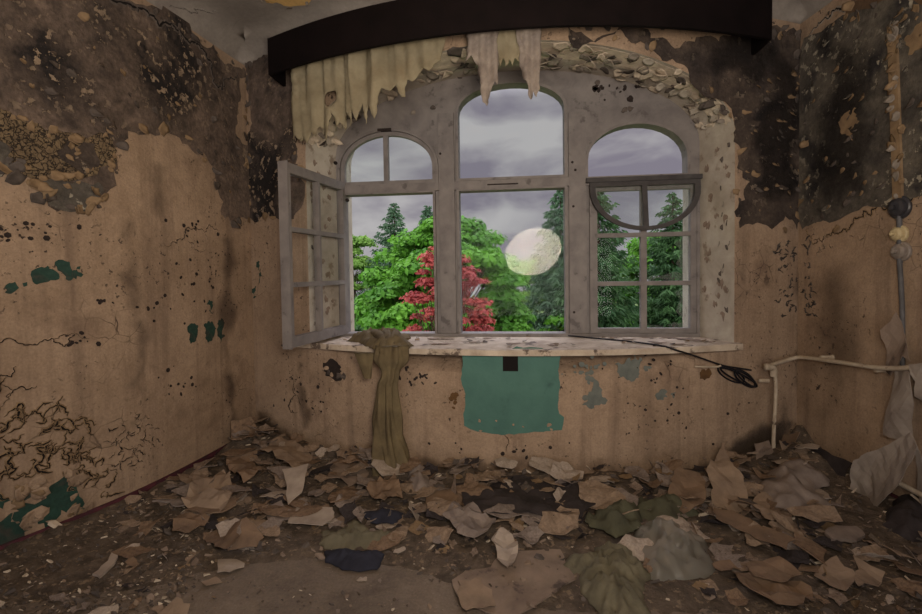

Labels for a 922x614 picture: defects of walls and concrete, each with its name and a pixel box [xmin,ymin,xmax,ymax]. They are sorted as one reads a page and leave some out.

peeling [407,47,478,84]
peeling [0,0,331,230]
peeling [308,88,398,148]
peeling [540,0,922,234]
peeling [0,221,52,242]
peeling [184,300,225,343]
peeling [713,264,729,322]
crack [0,332,161,501]
peeling [0,467,94,545]